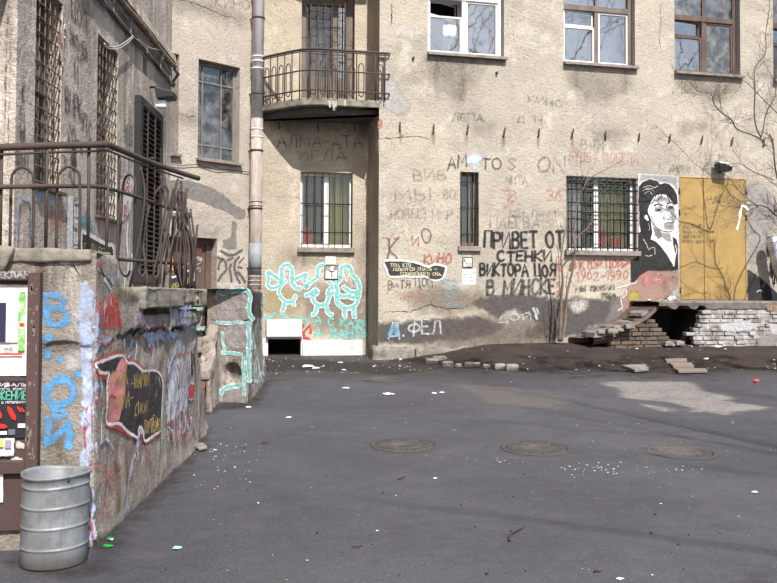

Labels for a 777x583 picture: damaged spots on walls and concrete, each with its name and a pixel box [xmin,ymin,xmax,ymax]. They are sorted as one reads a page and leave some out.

crack [381,299,475,314]